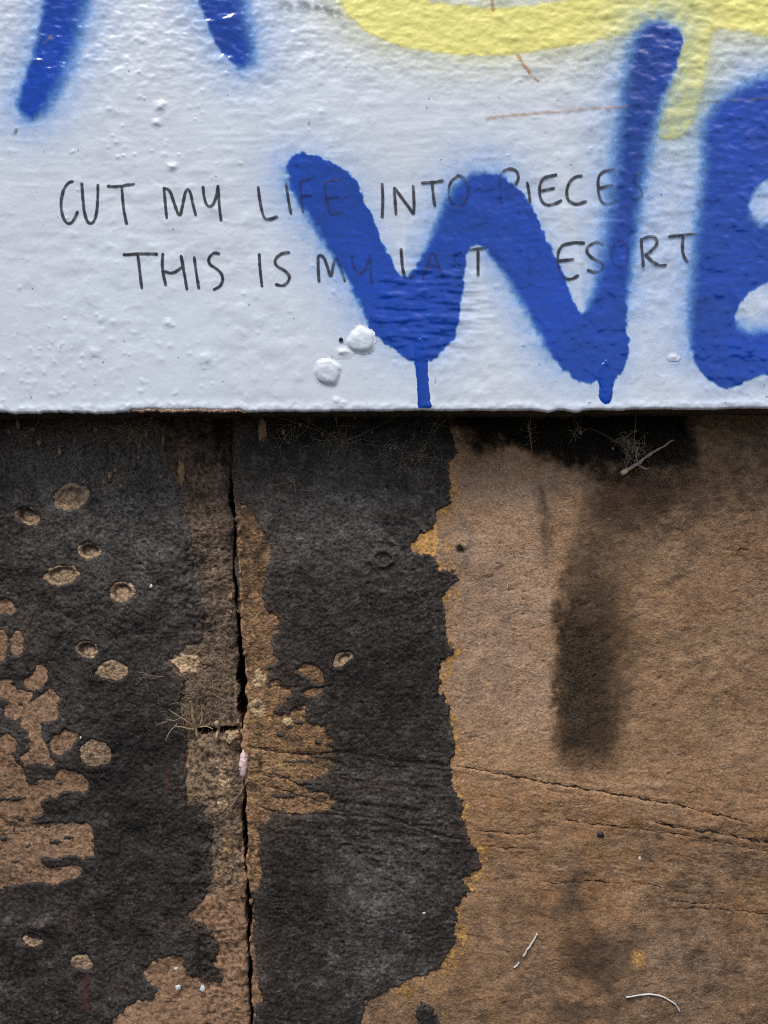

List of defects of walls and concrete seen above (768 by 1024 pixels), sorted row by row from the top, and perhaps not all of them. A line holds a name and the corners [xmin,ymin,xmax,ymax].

spalling [0,630,24,661]
peeling [0,665,111,889]
spalling [75,641,128,680]
spalling [110,507,334,1024]
crack [197,478,768,1024]
water stain [552,492,627,764]